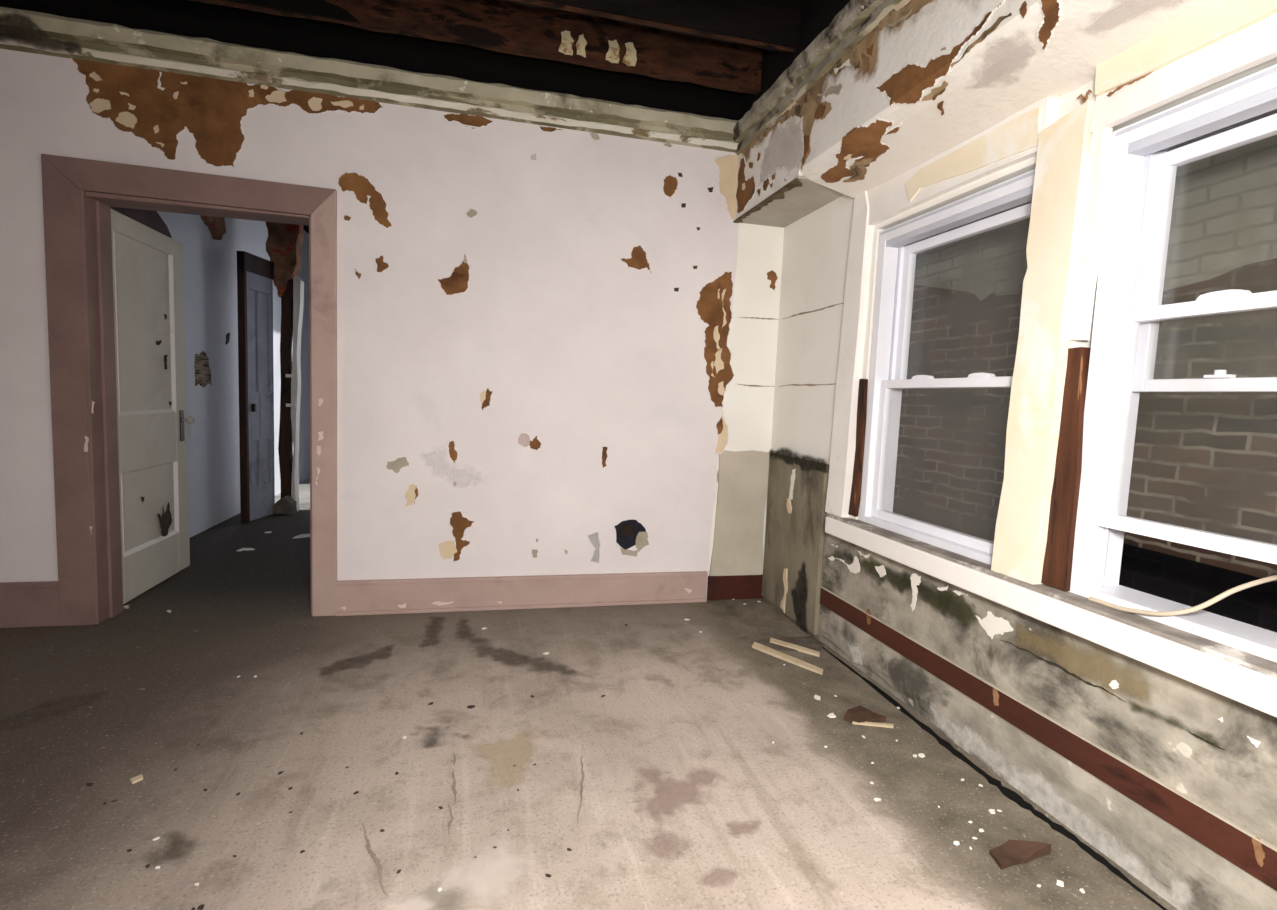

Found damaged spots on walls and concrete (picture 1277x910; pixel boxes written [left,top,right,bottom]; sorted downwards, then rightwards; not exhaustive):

peeling [70,58,385,168]
peeling [708,0,1063,220]
peeling [337,171,393,230]
peeling [436,254,471,296]
peeling [695,271,734,455]
leakage [770,448,827,471]
peeling [438,510,476,563]
leakage [791,564,807,632]
leakage [833,554,976,626]
leakage [848,644,865,665]
leakage [1017,626,1182,728]
leakage [931,706,1190,910]